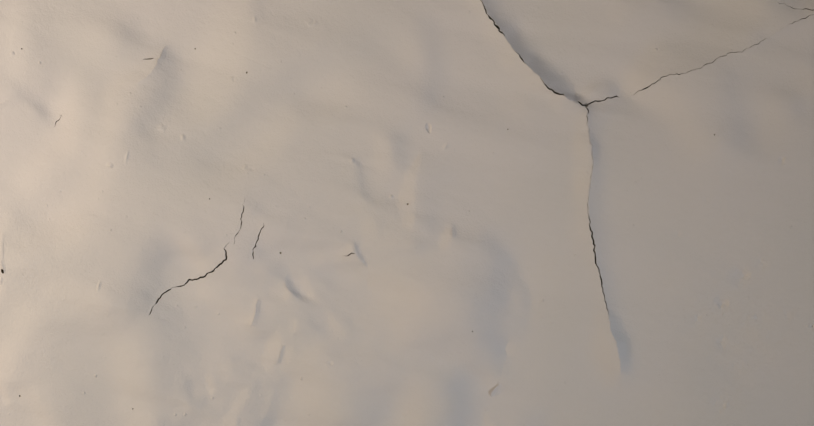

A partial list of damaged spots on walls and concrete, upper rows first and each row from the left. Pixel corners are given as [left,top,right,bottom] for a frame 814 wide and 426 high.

crack [146,197,267,317]
crack [476,0,814,321]